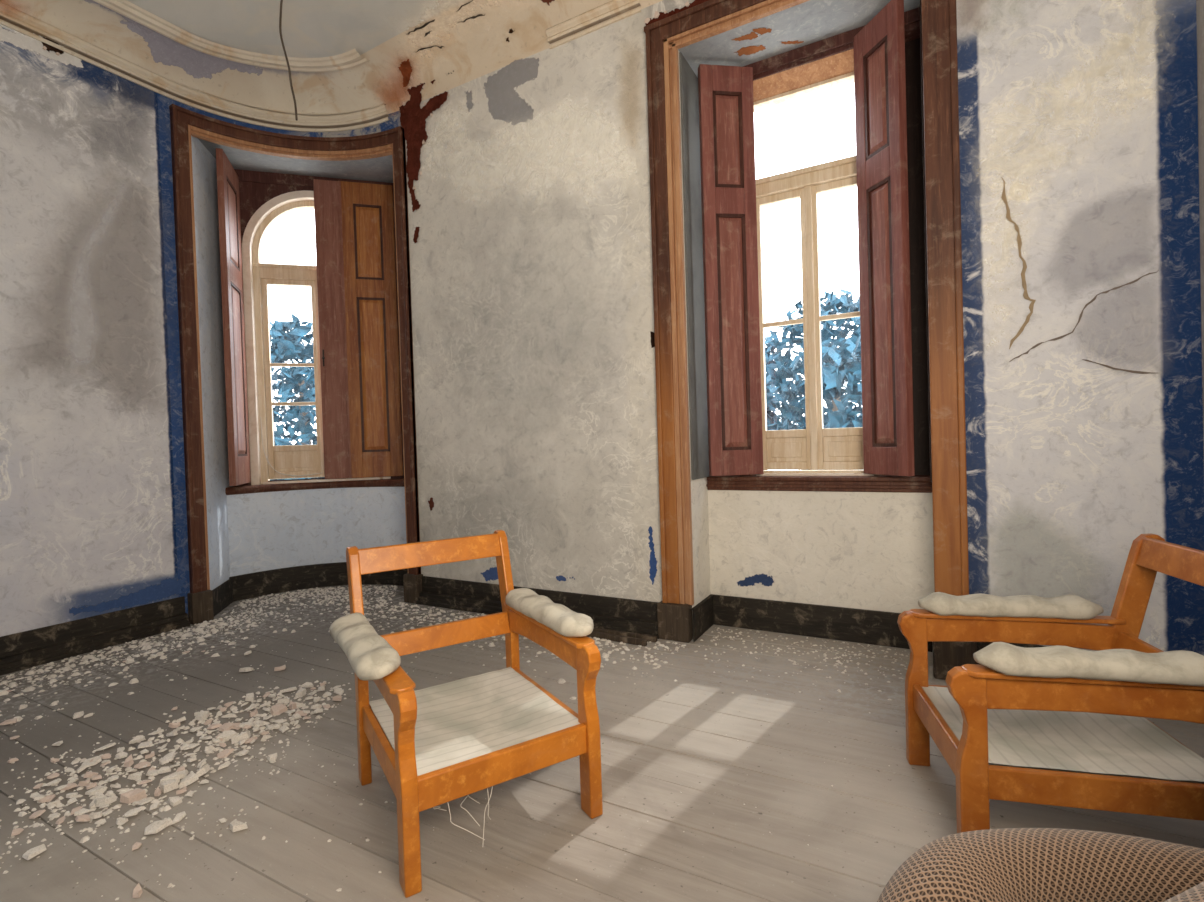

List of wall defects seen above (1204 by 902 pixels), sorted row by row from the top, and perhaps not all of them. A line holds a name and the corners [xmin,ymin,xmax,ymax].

peeling [0,26,83,68]
peeling [85,0,262,79]
crack [408,0,485,52]
flaking render [644,0,709,26]
peeling [466,58,539,125]
flaking render [398,59,449,212]
crack [1009,271,1158,374]